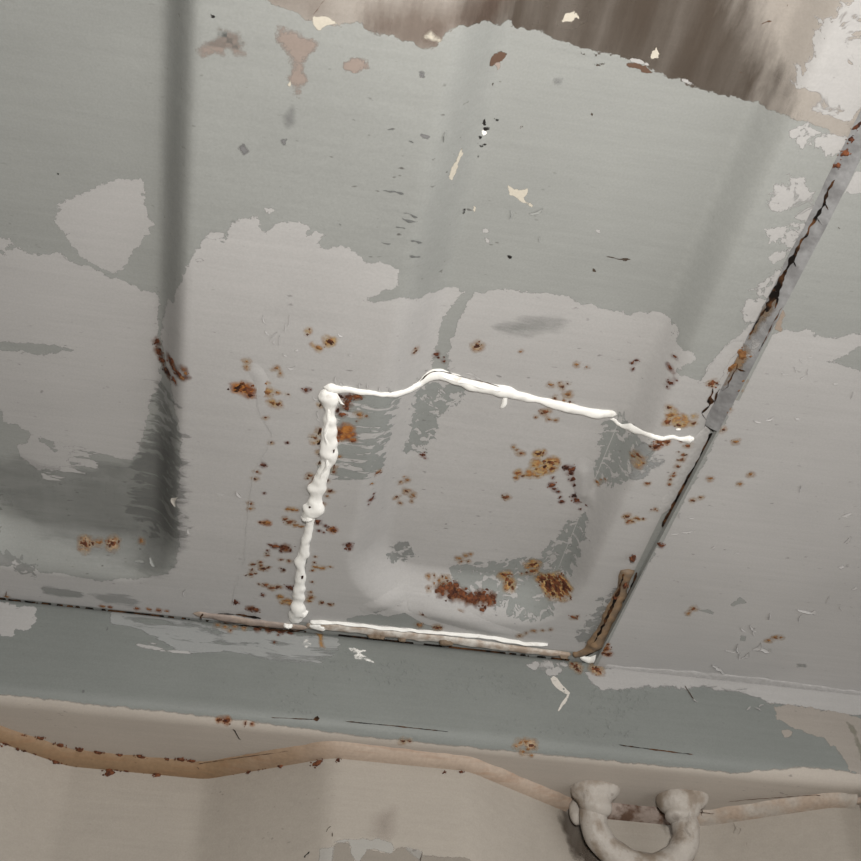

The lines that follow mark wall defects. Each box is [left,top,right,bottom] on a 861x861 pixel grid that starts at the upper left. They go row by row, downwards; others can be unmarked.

peeling [490,51,507,70]
peeling [627,47,659,73]
peeling [791,0,861,122]
peeling [789,121,848,157]
corrosion [832,121,861,168]
crack [749,180,835,351]
corrosion [152,339,189,384]
corrosion [227,381,289,406]
crack [702,364,744,427]
peeling [0,171,861,691]
corrosion [512,446,587,510]
corrosion [426,560,573,612]